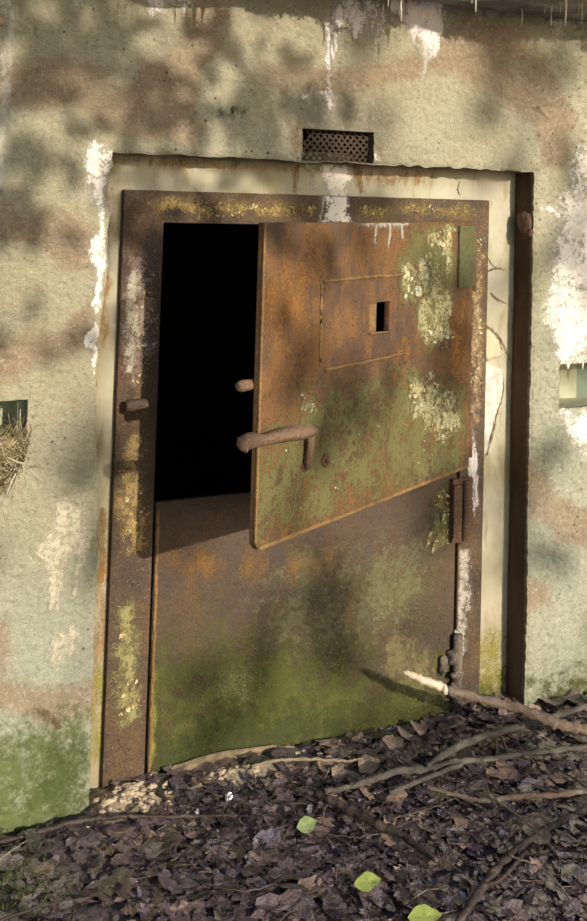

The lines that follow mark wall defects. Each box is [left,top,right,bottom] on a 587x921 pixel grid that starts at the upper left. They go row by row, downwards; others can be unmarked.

water stain [0,0,16,190]
water stain [301,0,446,110]
water stain [544,0,587,44]
water stain [70,140,113,375]
peeling [256,200,505,654]